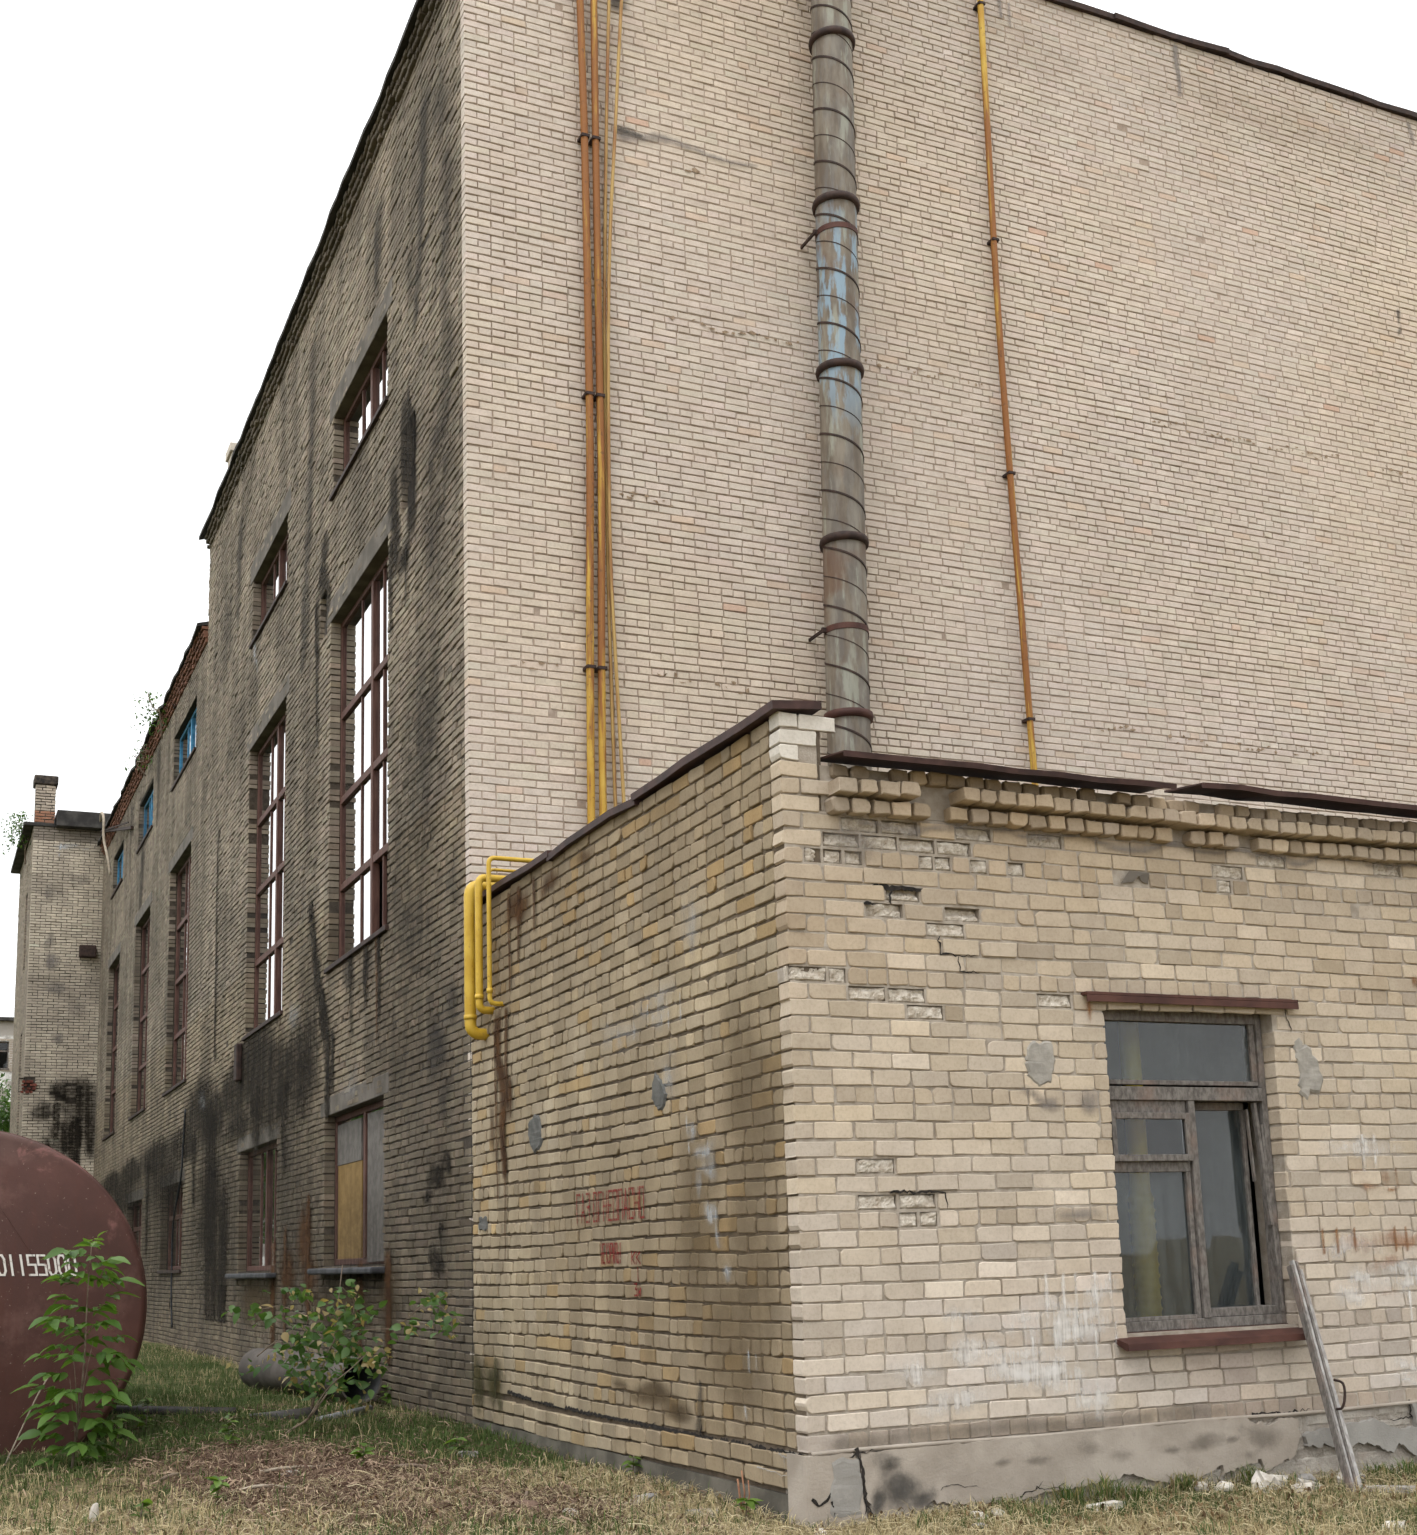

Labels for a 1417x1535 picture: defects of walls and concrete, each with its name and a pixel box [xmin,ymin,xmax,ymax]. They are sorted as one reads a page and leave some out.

leakage [388,539,407,637]
spalling [783,966,942,1020]
spalling [858,1194,936,1227]